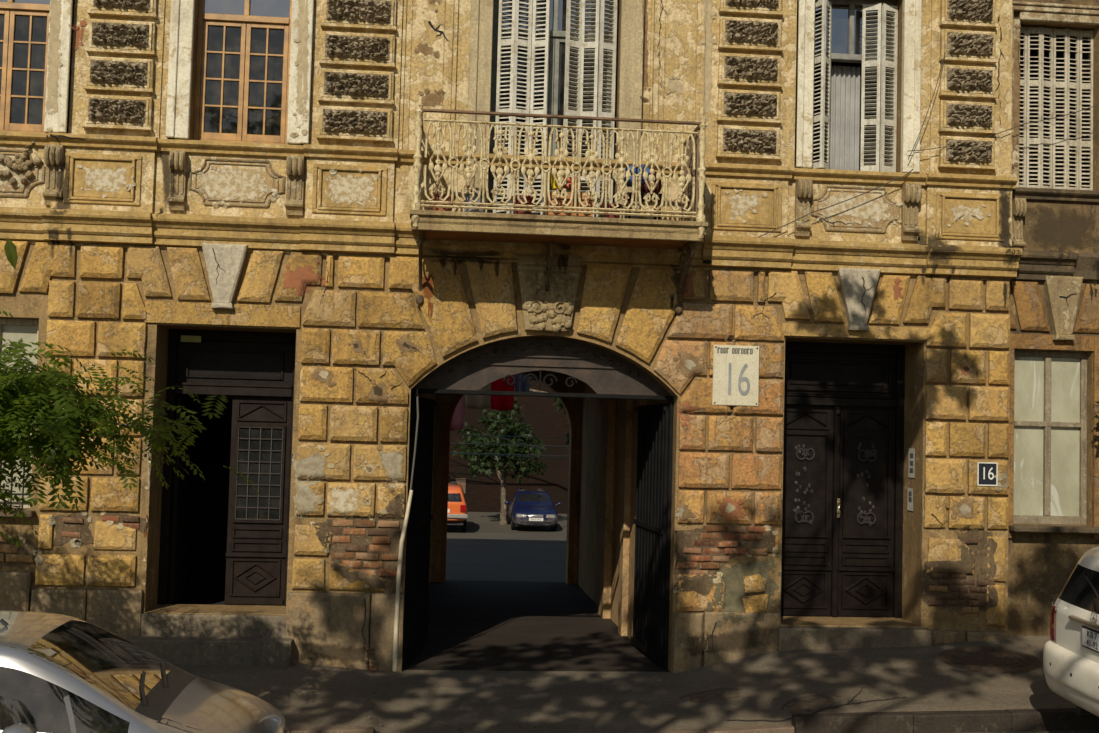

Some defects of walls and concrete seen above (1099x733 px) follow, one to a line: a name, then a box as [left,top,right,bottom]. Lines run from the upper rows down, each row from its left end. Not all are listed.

flaking render [282,260,327,296]
flaking render [0,430,151,586]
flaking render [292,445,406,595]
flaking render [674,497,780,626]
flaking render [921,494,999,616]